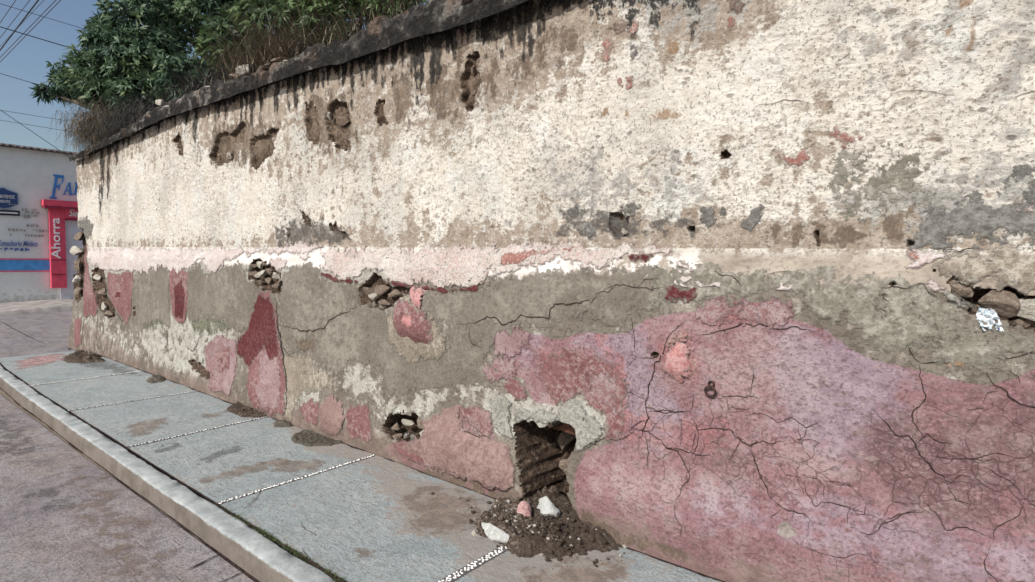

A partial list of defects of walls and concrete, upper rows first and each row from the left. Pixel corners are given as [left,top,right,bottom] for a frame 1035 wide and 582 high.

spalling [459,51,481,112]
spalling [304,98,352,151]
leakage [77,0,700,240]
leakage [274,217,349,248]
flaking render [70,121,1035,501]
crack [458,277,661,349]
crack [585,320,1035,582]